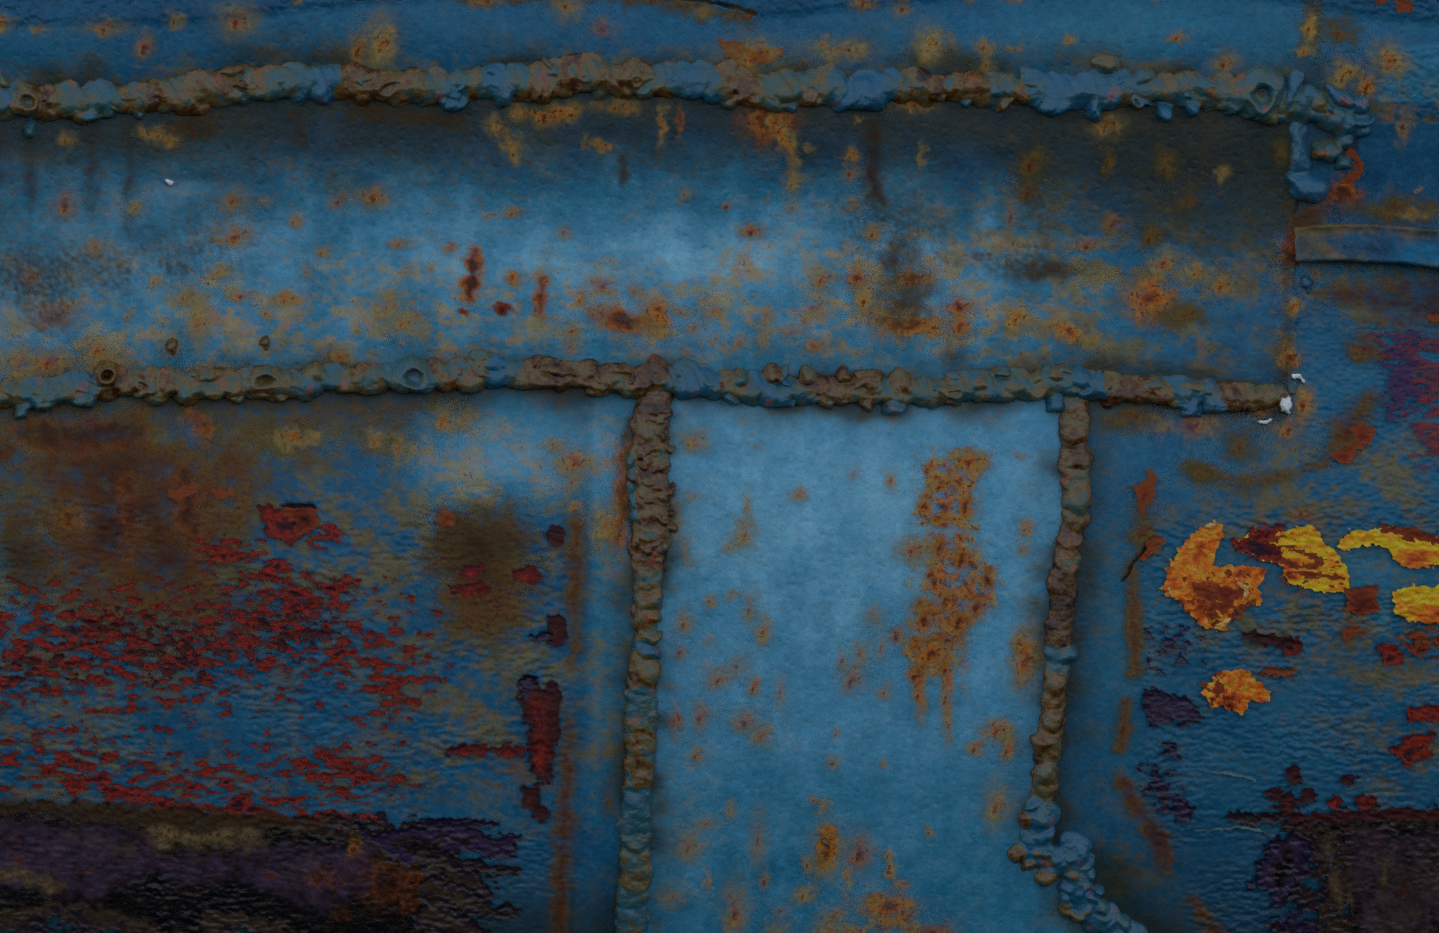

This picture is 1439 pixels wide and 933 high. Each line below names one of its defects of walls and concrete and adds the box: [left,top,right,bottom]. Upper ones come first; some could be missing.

crack [681,0,757,16]
peeling [1376,0,1416,13]
corrosion [444,241,485,316]
corrosion [577,277,722,339]
corrosion [812,224,973,337]
peeling [1330,313,1439,469]
corrosion [839,446,1005,737]
peeling [0,503,523,933]
peeling [438,674,562,824]
peeling [1122,520,1439,828]
corrosion [795,797,866,903]
corrosion [816,850,948,933]